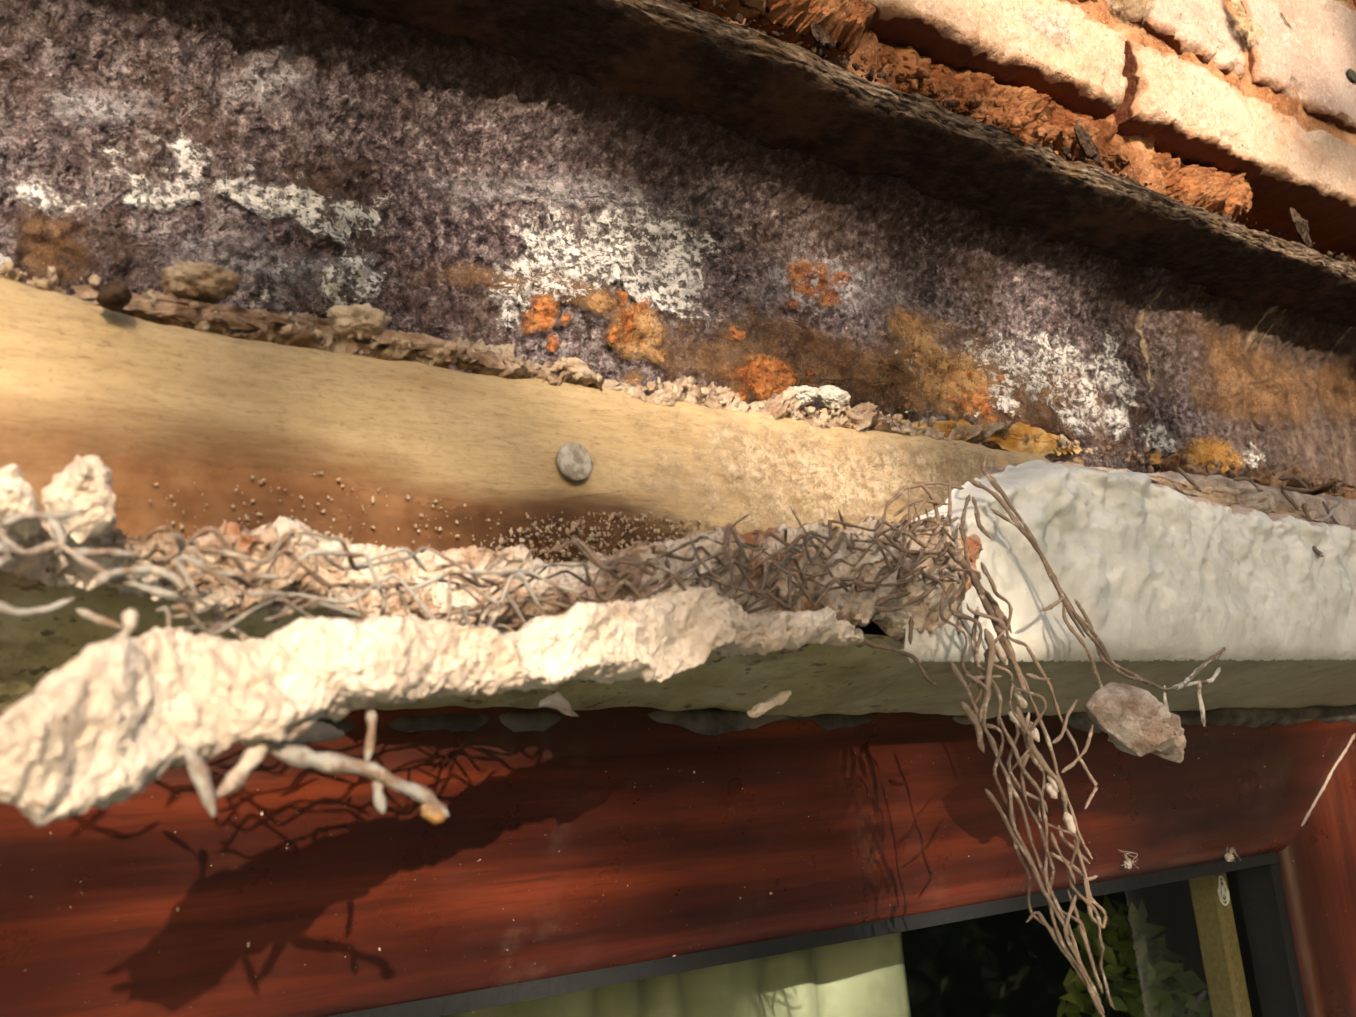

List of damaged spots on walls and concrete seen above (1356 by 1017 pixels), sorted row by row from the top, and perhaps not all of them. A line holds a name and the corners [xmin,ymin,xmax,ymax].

rust [809,23,835,49]
rust [1074,123,1101,163]
rust [18,212,86,281]
rust [1289,207,1313,249]
rust [445,259,1103,456]
rust [1148,437,1245,475]
spalling [1149,475,1246,506]
spalling [1271,502,1356,530]
spalling [0,514,983,644]
spalling [776,644,809,655]